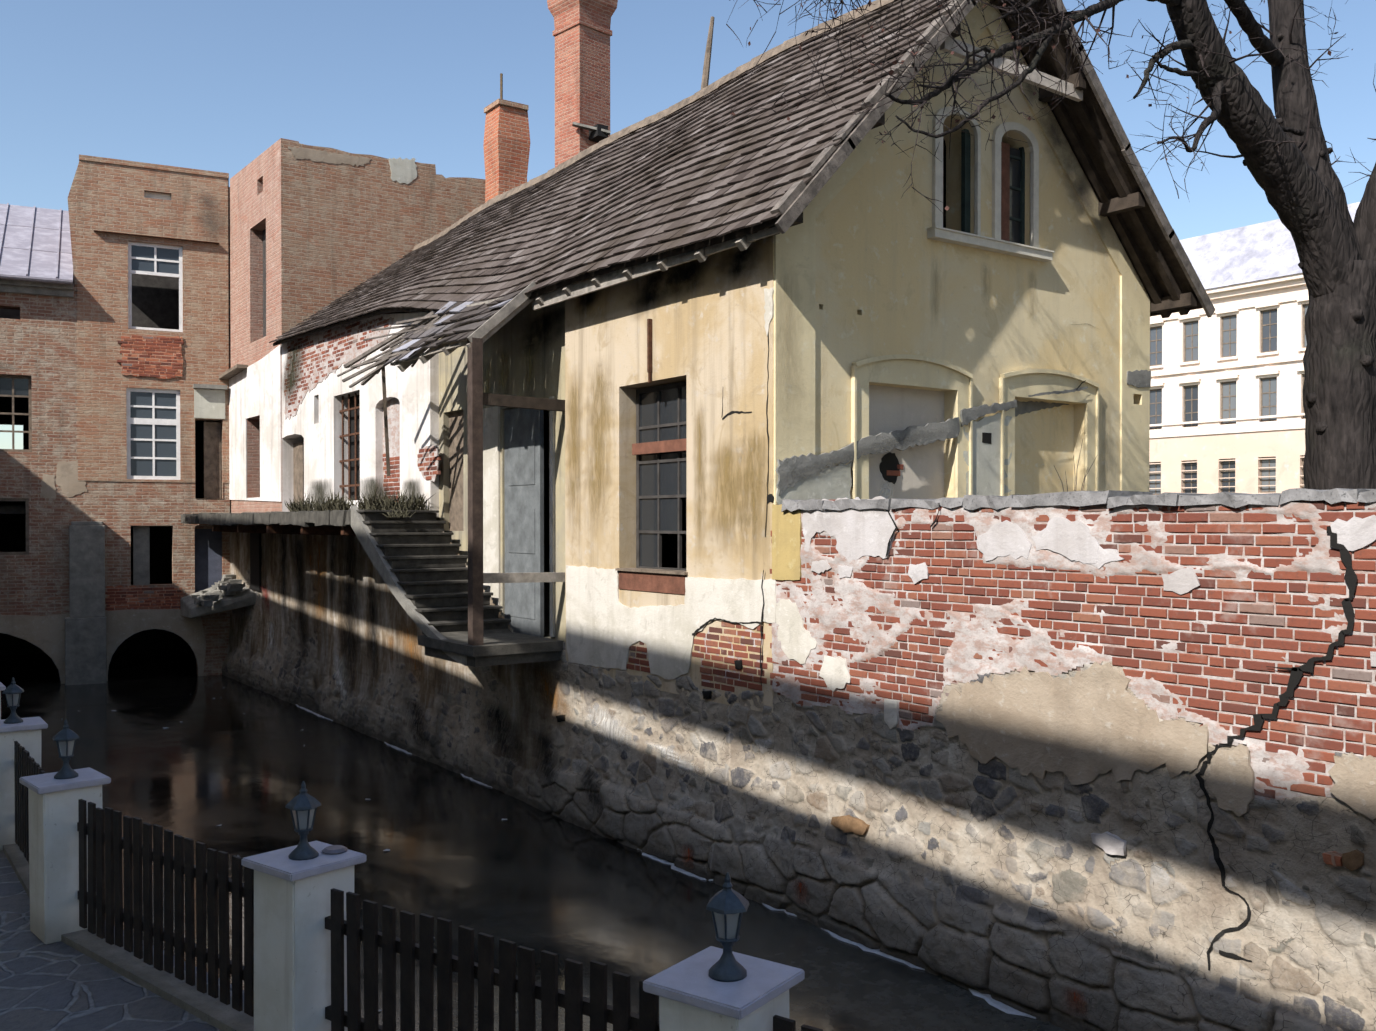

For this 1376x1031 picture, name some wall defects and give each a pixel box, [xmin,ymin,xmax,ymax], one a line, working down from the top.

water stain [580,291,596,309]
flaking render [284,316,394,419]
water stain [280,535,306,652]
water stain [330,535,377,696]
water stain [571,377,605,501]
water stain [720,442,761,531]
flaking render [692,599,852,692]
peeling [767,452,903,580]
peeling [976,517,1124,569]
peeling [1330,515,1376,551]
peeling [936,662,1255,817]
crack [1195,526,1357,971]